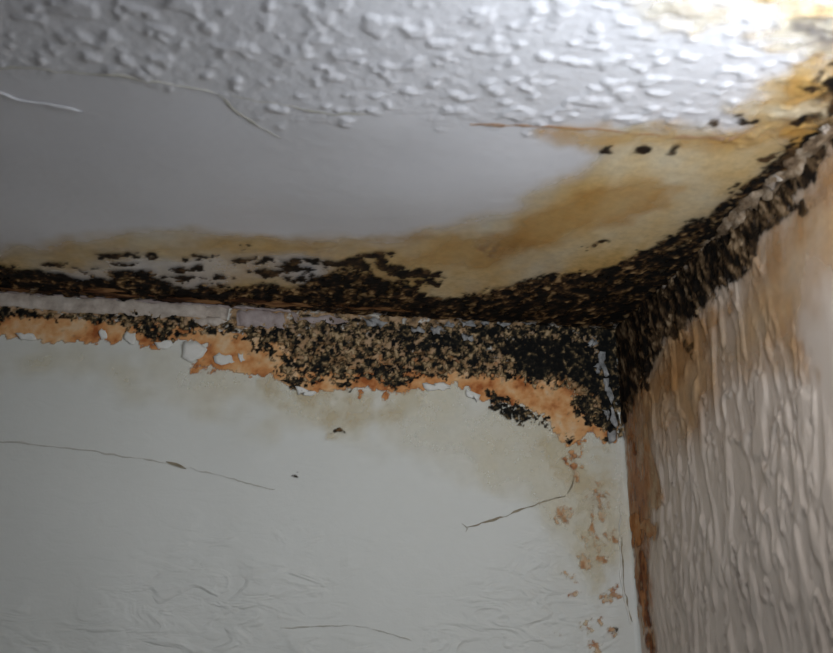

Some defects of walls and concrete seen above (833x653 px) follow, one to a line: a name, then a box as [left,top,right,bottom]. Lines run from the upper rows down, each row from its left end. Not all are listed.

damp [756,0,833,48]
crack [0,66,370,138]
damp [0,58,833,455]
peeling [0,291,619,457]
crack [0,441,275,490]
crack [463,458,576,531]